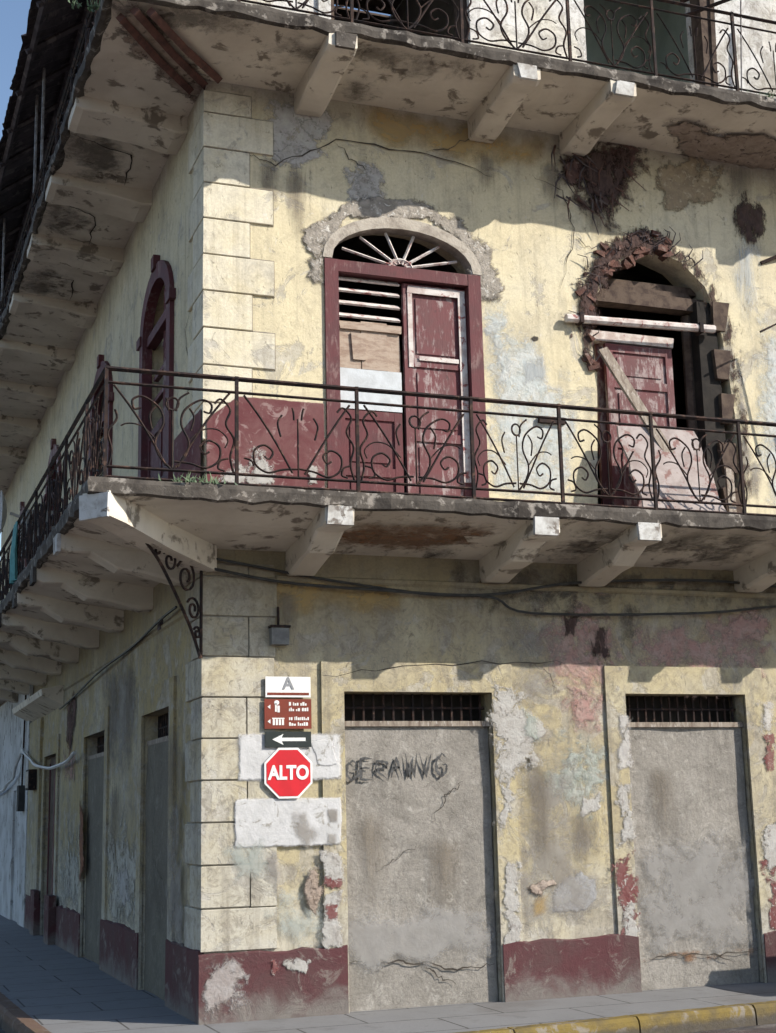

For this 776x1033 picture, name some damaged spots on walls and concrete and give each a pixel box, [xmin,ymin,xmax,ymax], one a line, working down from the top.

water stain [63,136,132,185]
crack [246,139,491,177]
flaking render [548,142,724,372]
peeling [301,163,575,496]
peeling [218,447,274,485]
crack [326,660,582,701]
peeling [761,701,775,771]
peeling [486,607,771,945]
peeling [760,824,776,933]
crack [349,959,493,984]